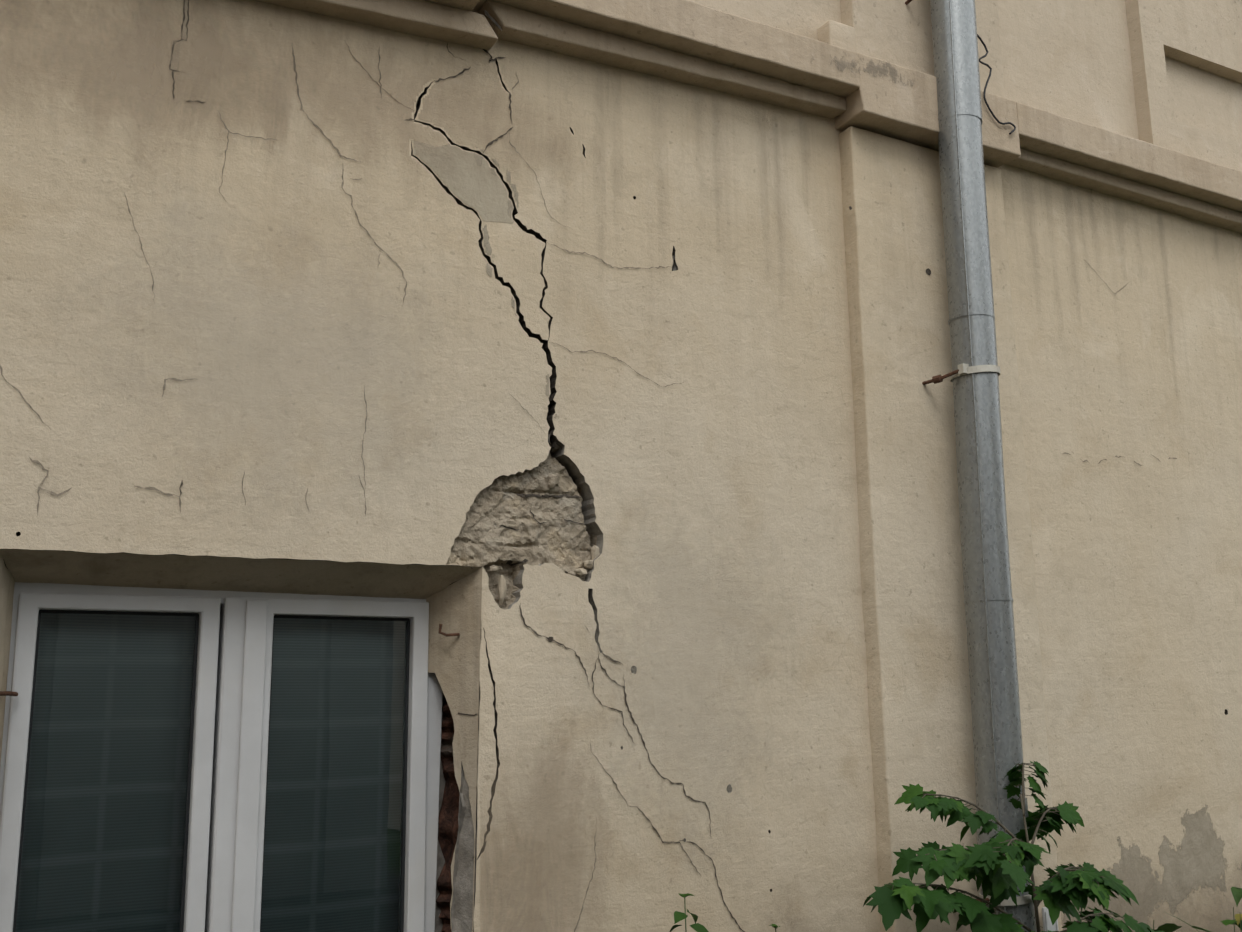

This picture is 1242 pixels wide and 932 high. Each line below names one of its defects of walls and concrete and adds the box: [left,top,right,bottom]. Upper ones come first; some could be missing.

crack [124,193,155,303]
crack [169,0,276,202]
crack [292,47,407,301]
crack [348,10,681,449]
crack [0,366,49,427]
crack [358,387,367,516]
flaking render [446,434,603,610]
flaking render [435,693,477,932]
crack [458,628,500,860]
crack [519,588,745,932]